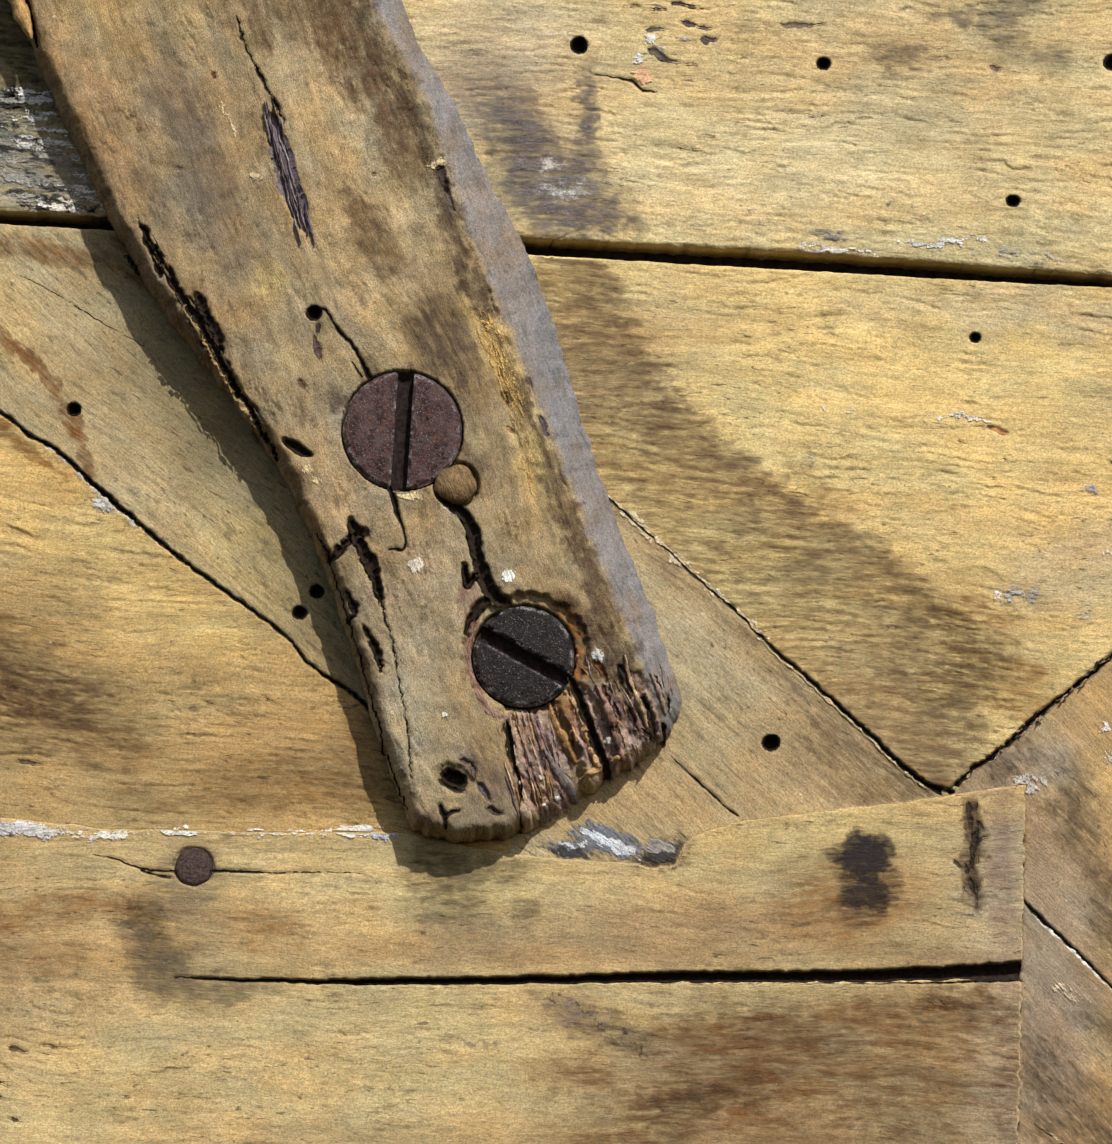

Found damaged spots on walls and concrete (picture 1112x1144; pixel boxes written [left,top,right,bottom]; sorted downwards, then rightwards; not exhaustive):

crack [236,16,285,124]
crack [124,215,311,462]
crack [0,412,413,810]
crack [438,804,461,830]
spalling [460,618,677,865]
corrosion [557,600,608,679]
leakage [536,257,1044,806]
crack [177,962,1020,988]